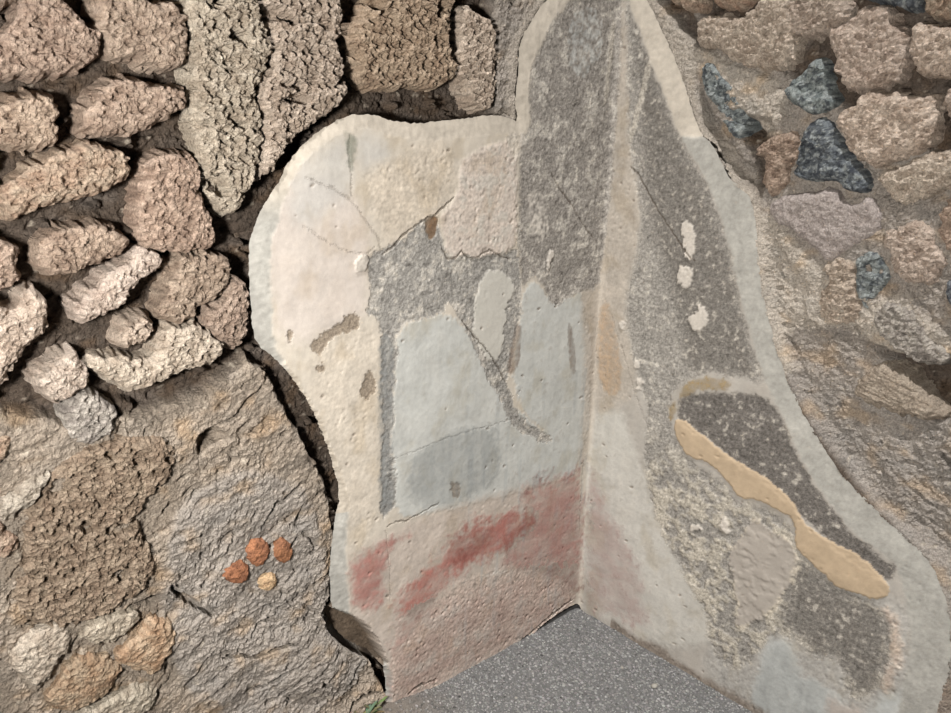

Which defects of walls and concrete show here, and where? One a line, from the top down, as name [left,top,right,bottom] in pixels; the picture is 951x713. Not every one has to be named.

crack [302,133,455,257]
crack [441,246,511,261]
crack [461,319,507,383]
spalling [309,0,896,701]